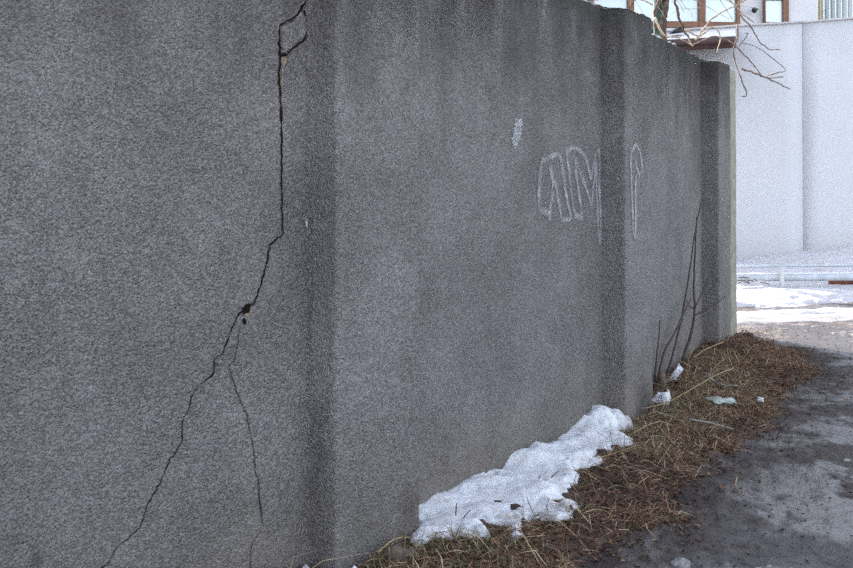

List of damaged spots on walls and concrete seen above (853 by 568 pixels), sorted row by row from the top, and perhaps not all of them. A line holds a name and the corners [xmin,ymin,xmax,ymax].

crack [102,0,307,568]